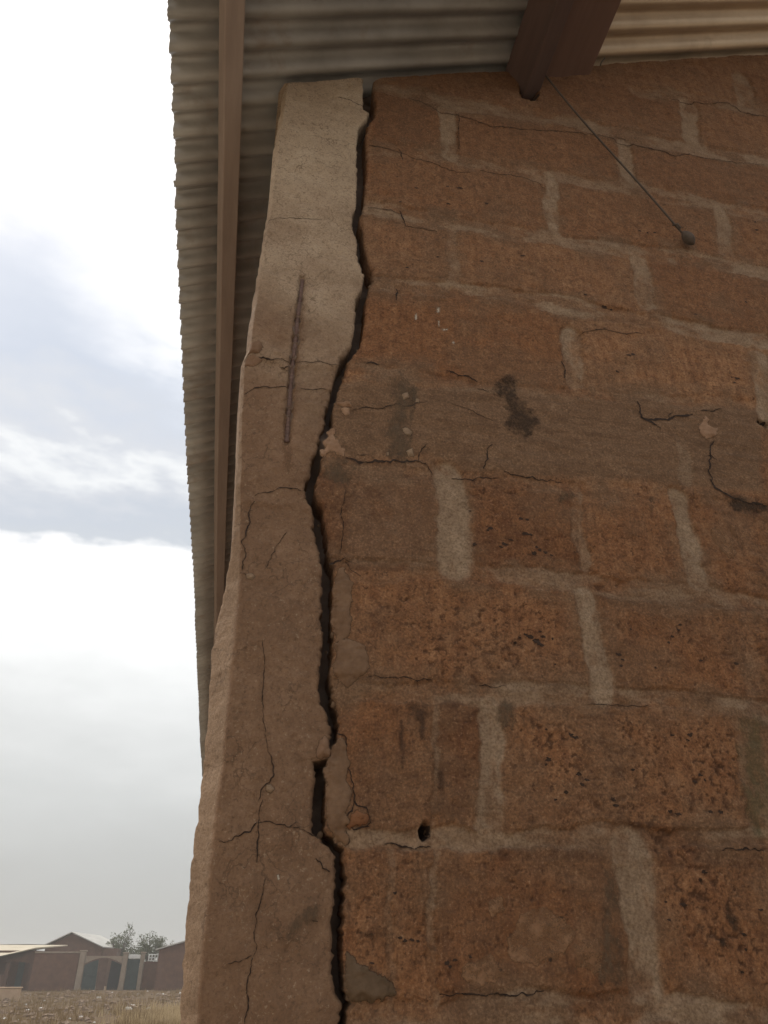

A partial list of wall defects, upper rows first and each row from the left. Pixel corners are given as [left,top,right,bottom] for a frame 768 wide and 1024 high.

leakage [494,375,540,436]
crack [219,96,767,1024]
peeling [344,951,397,1004]